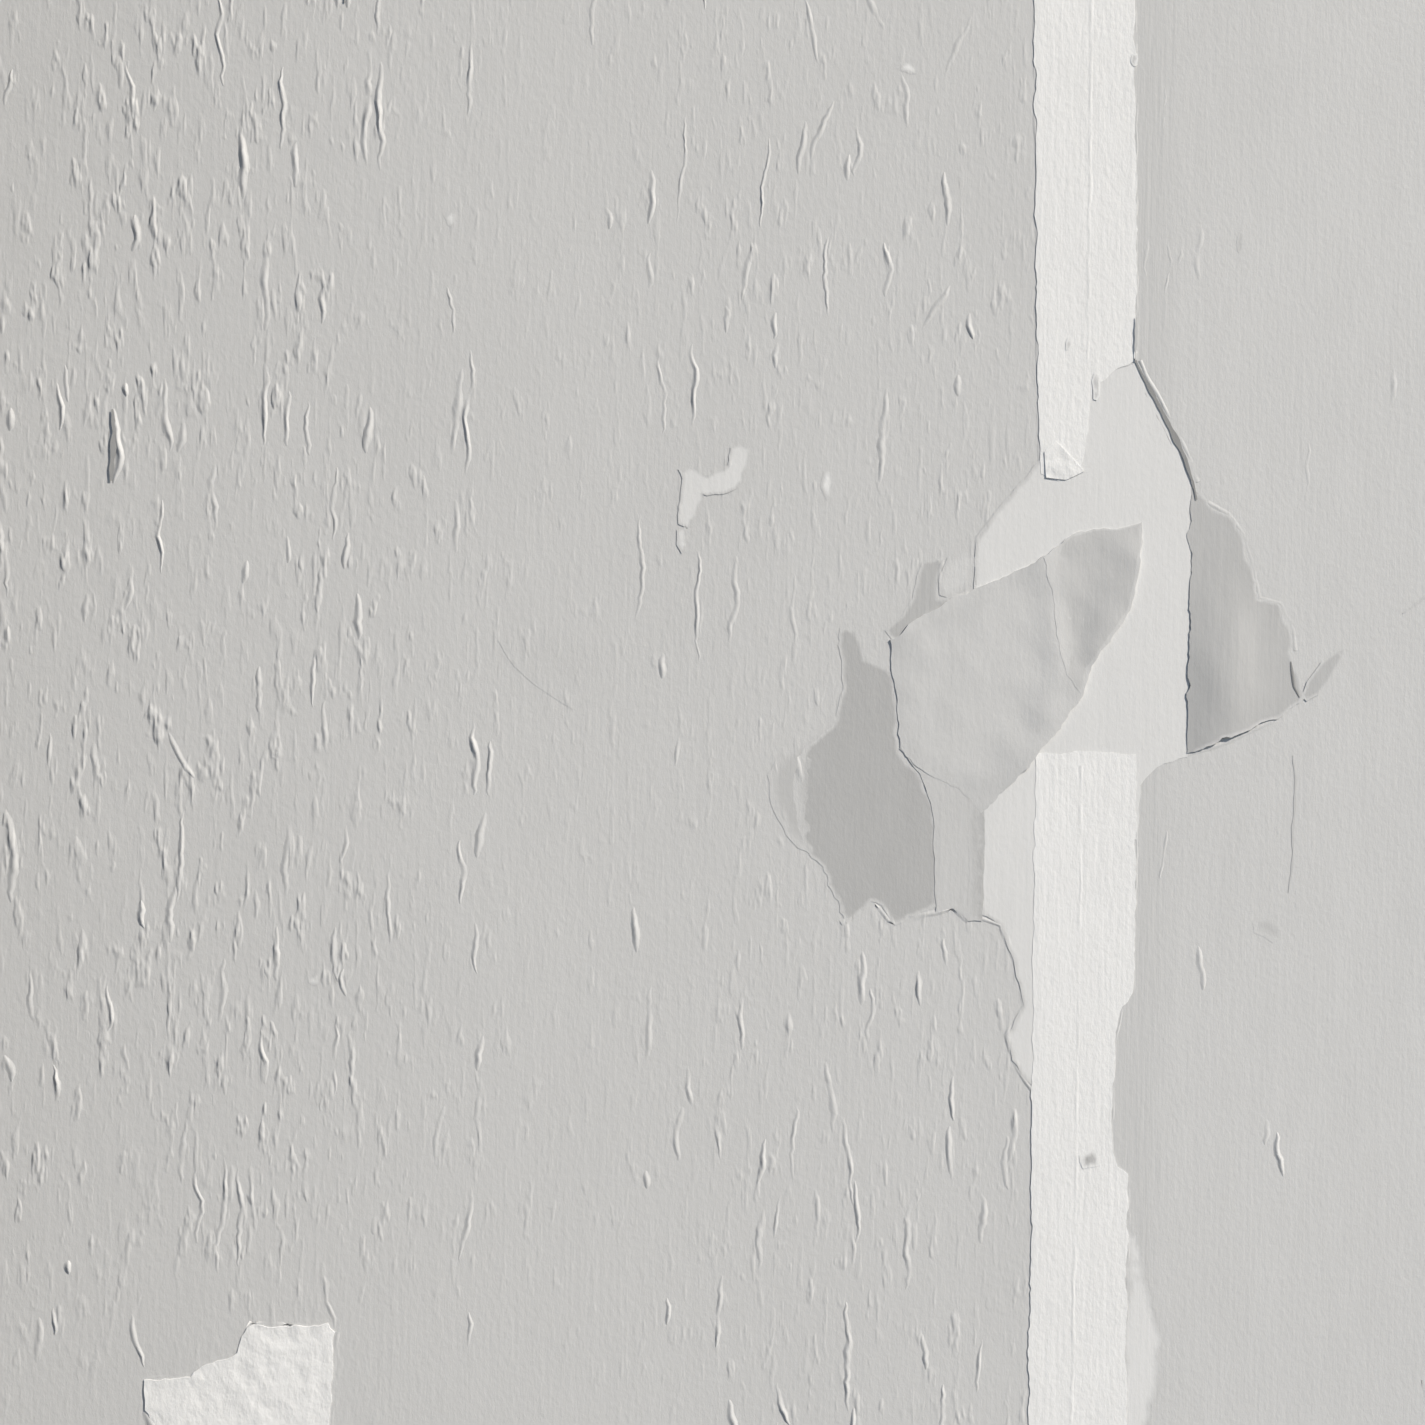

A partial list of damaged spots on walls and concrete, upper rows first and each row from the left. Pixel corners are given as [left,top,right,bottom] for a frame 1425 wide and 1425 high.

peeling [676,443,751,553]
peeling [767,0,1349,1425]
peeling [142,1319,340,1425]